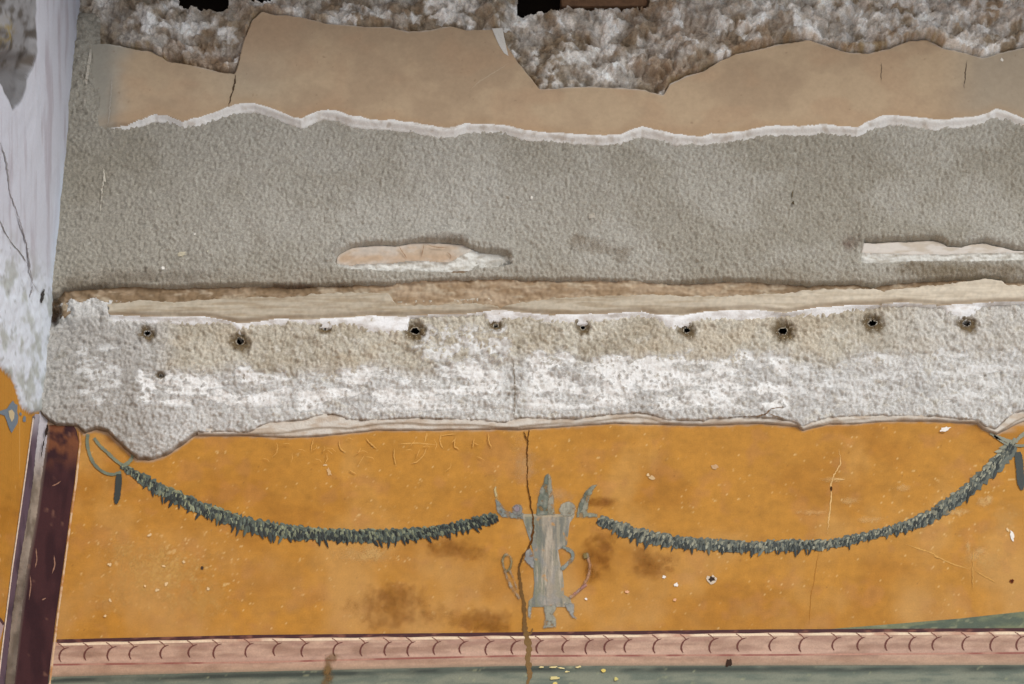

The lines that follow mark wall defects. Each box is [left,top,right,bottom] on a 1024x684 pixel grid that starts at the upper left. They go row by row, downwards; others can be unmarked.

flaking render [79,0,1024,95]
spalling [113,103,1024,147]
crack [0,143,45,303]
spalling [337,250,513,272]
spalling [861,252,1024,264]
spalling [40,297,1024,461]
crack [513,361,535,684]